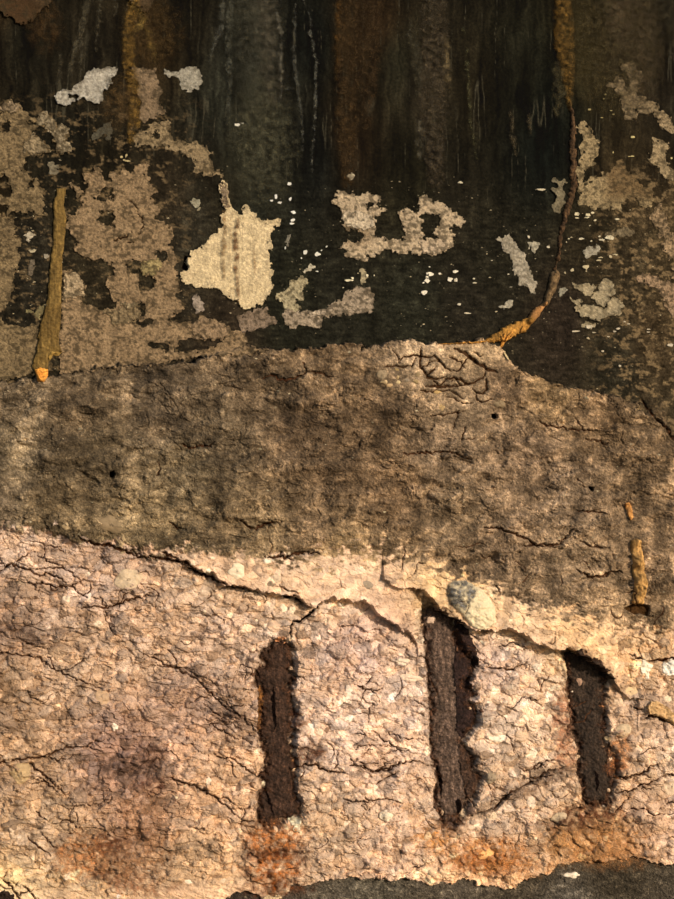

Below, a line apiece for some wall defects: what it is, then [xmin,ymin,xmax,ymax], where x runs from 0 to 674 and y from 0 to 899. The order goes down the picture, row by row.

peeling [600,62,674,181]
peeling [0,99,75,381]
peeling [48,66,466,374]
peeling [550,120,674,318]
peeling [558,268,630,337]
crack [0,551,157,611]
crack [78,536,258,593]
crack [264,551,319,560]
crack [280,586,321,639]
spalling [0,515,674,899]
crack [630,654,674,662]
corrosion [246,640,324,895]